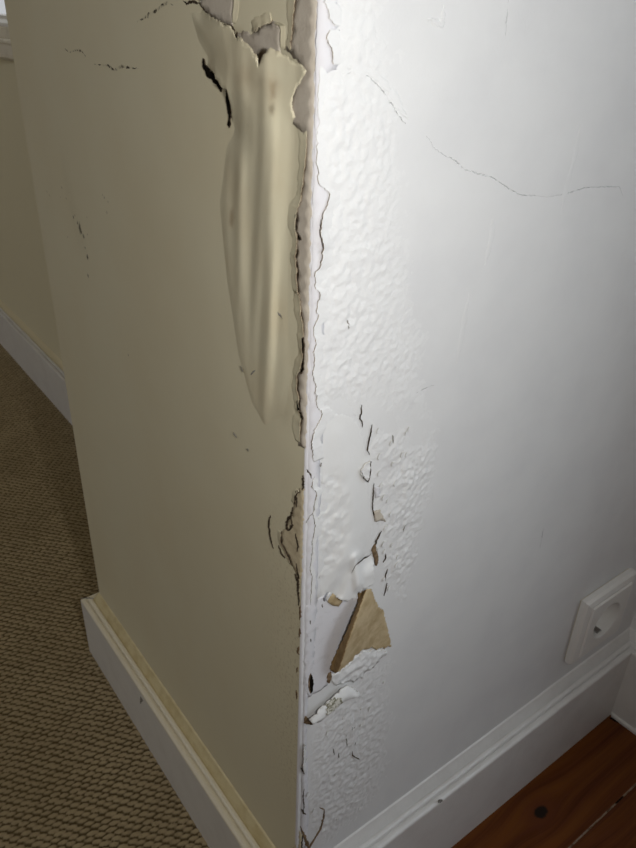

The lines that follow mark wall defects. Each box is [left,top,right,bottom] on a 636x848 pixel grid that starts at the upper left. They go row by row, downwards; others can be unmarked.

flaking render [184,0,391,848]